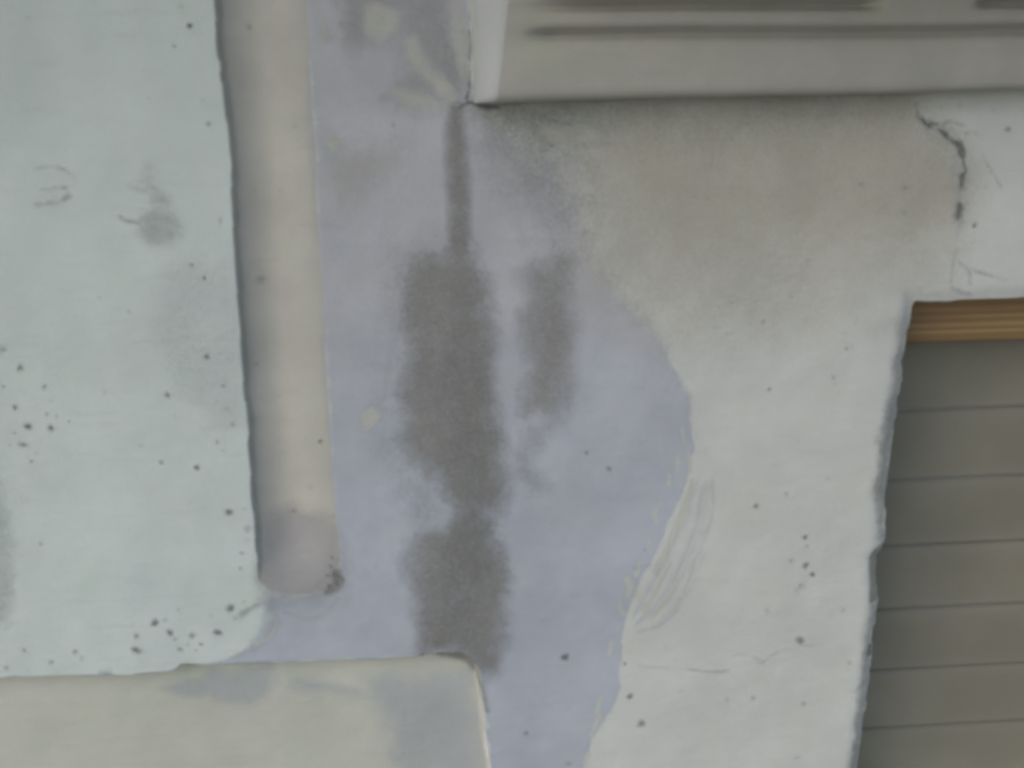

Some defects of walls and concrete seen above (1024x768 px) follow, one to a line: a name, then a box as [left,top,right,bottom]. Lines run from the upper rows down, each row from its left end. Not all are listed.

crack [914,105,1001,296]
water stain [354,99,520,714]
spalling [322,556,345,596]